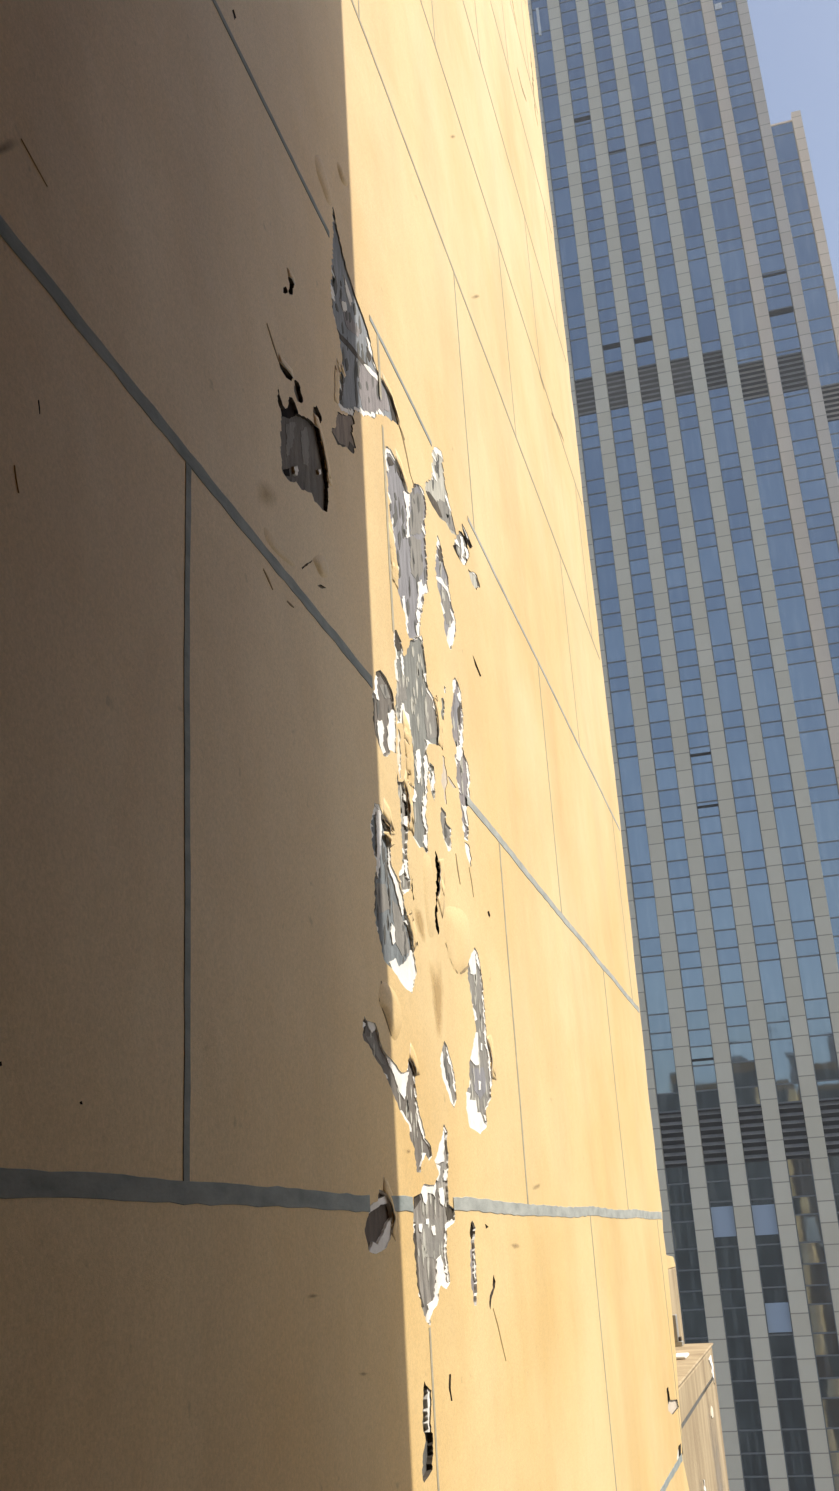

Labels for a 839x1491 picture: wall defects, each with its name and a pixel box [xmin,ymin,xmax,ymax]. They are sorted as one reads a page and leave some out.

peeling [277,207,400,512]
peeling [370,446,480,993]
peeling [362,1016,455,1325]
peeling [440,948,496,1134]
flaking render [422,1382,433,1482]